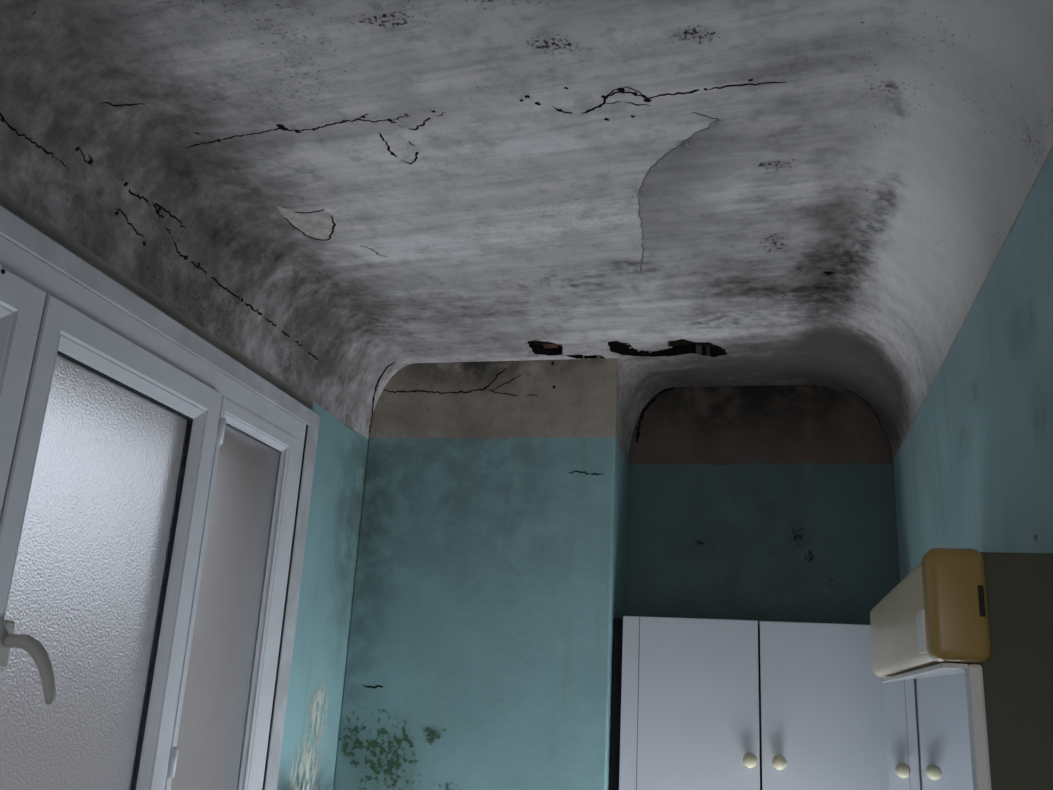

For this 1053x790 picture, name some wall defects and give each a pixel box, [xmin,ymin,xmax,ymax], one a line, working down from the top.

water stain [351,13,425,28]
water stain [527,36,578,55]
crack [101,100,147,108]
crack [520,79,785,121]
crack [0,113,93,168]
crack [187,110,445,164]
crack [115,179,319,361]
spalling [524,339,730,359]
water stain [291,688,327,790]
water stain [338,710,417,790]
water stain [423,727,446,745]